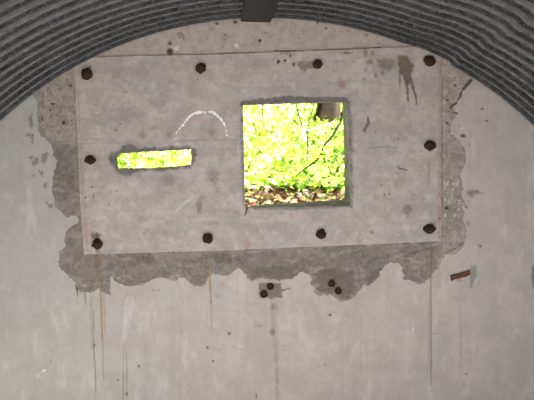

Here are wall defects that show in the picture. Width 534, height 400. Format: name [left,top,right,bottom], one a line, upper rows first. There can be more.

peeling [26,57,470,302]
leakage [380,56,417,104]